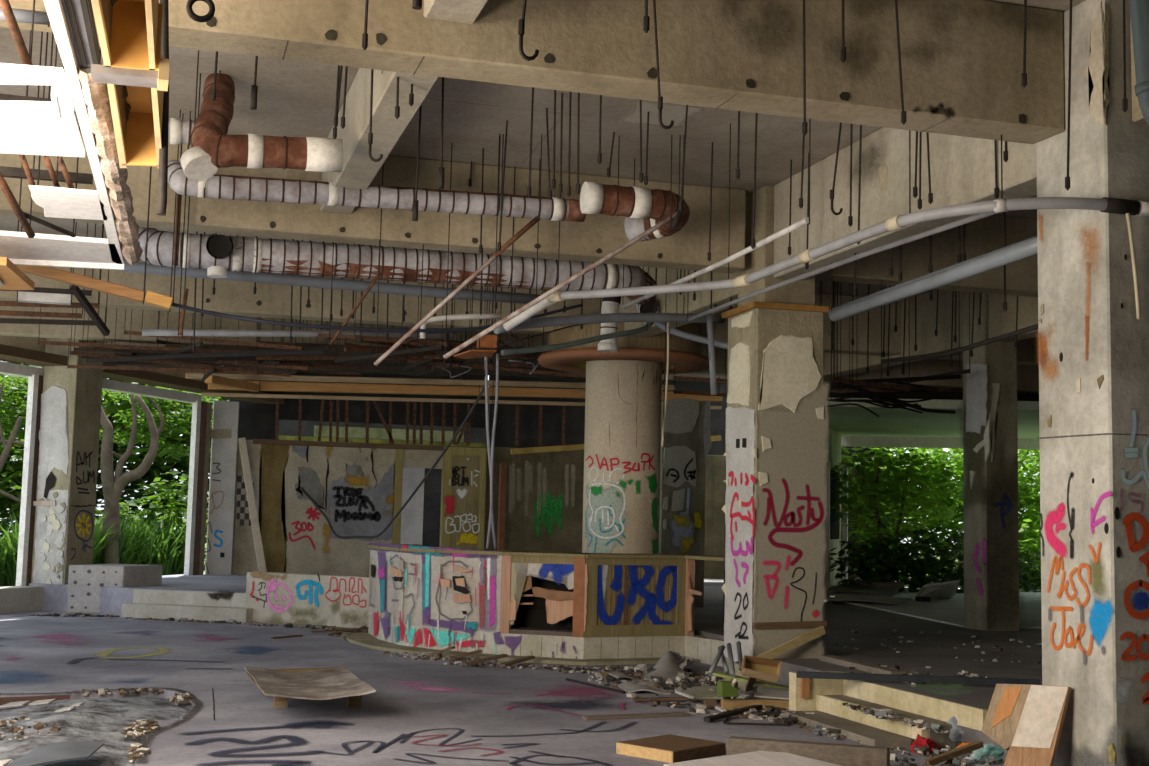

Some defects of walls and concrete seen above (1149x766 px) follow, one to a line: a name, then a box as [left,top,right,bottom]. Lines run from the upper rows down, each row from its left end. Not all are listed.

peeling [731,311,753,328]
rust [1085,233,1095,360]
peeling [662,335,822,664]